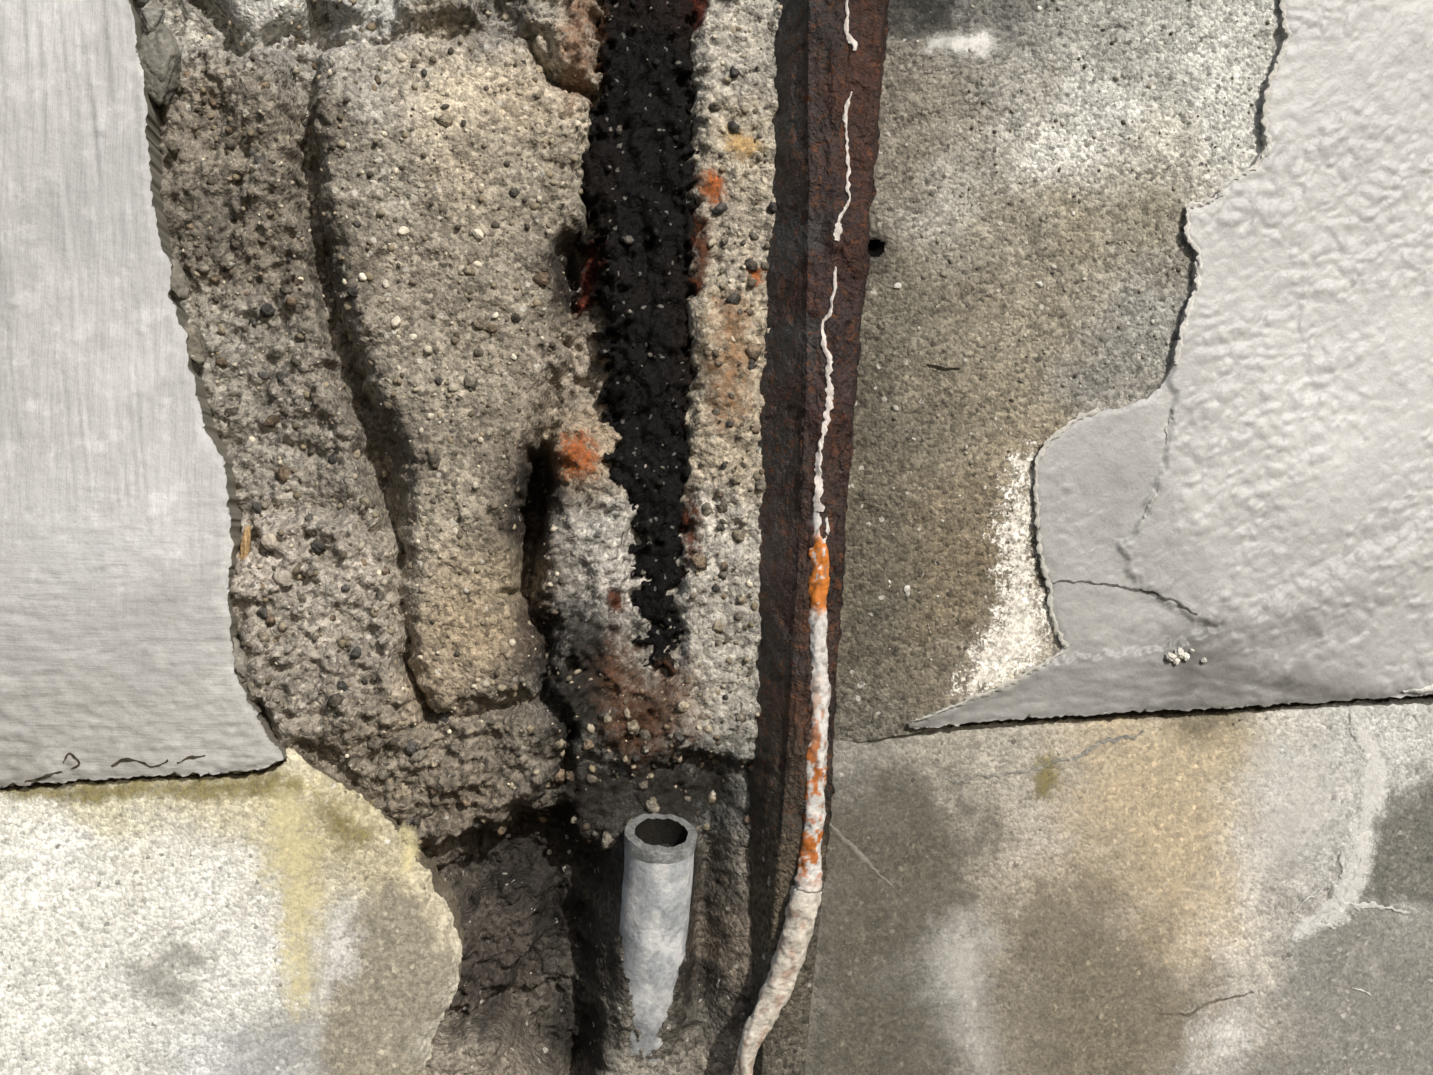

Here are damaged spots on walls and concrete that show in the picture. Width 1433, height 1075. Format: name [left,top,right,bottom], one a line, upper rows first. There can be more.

rust [556,0,725,684]
peeling [813,267,837,512]
peeling [833,0,1291,742]
spalling [133,0,783,1075]
water stain [950,440,1054,698]
crack [1044,580,1198,615]
crack [939,684,1433,784]
water stain [234,880,454,1075]
water stain [808,781,1001,1075]
water stain [1020,894,1252,1075]
crack [1292,809,1410,939]
water stain [1275,720,1433,1075]